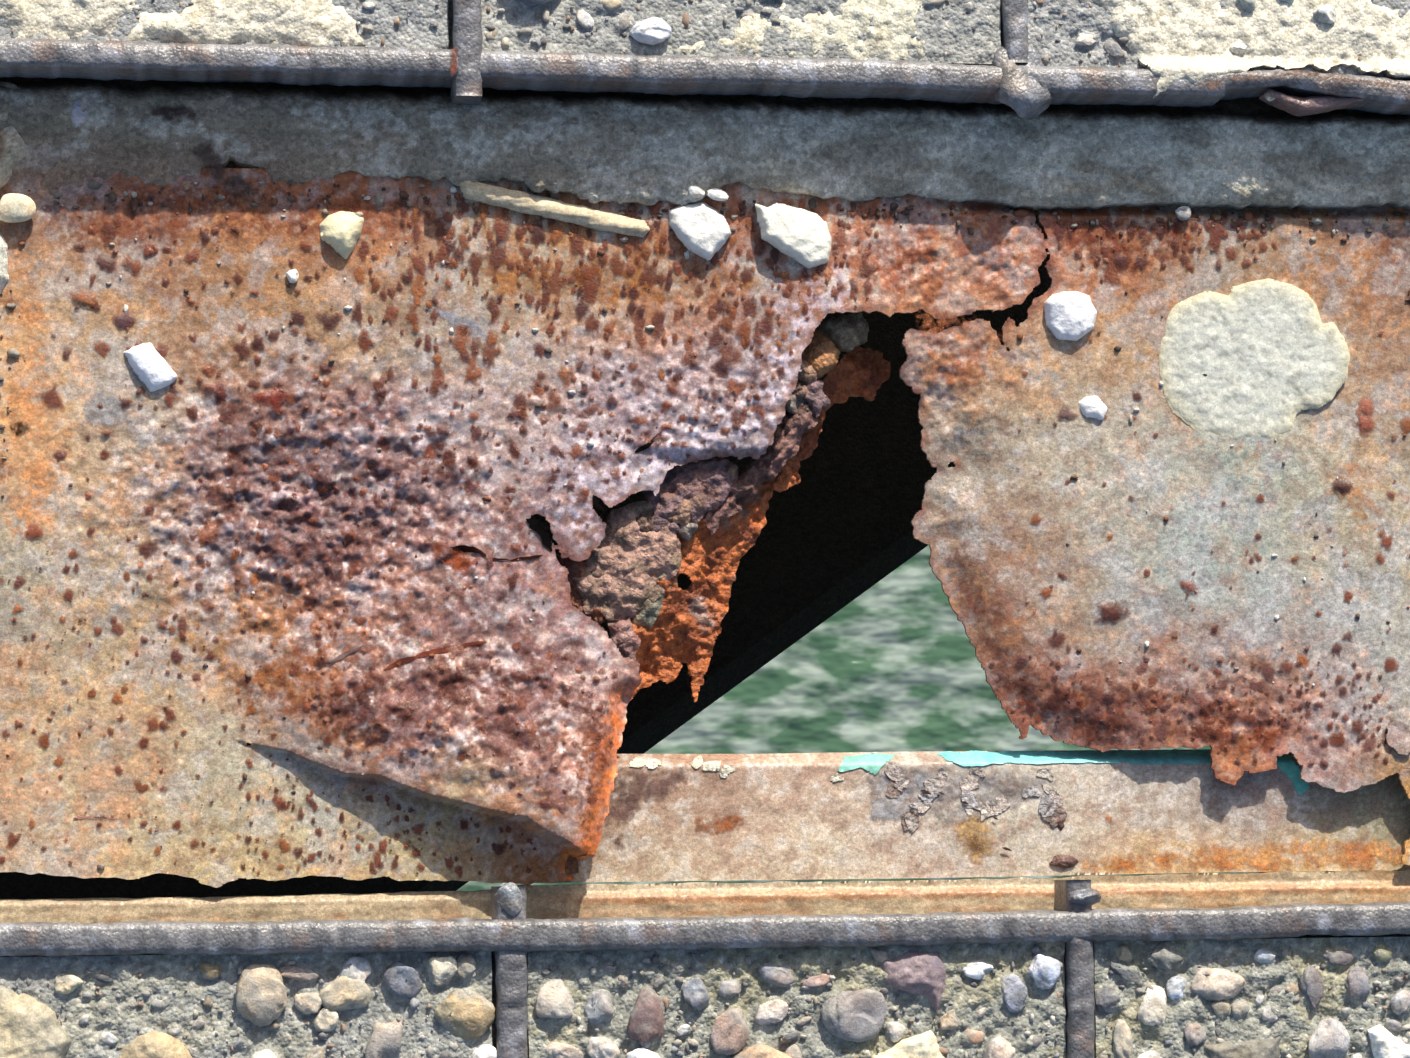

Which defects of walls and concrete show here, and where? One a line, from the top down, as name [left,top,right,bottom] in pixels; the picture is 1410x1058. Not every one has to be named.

rust [1054,212,1277,284]
rust [1038,406,1078,427]
rust [1355,397,1373,434]
rust [1392,418,1410,440]
rust [1333,464,1372,519]
rust [0,186,936,878]
rust [1376,529,1392,563]
rust [1025,572,1067,613]
rust [1181,571,1197,610]
rust [965,589,1410,768]
rust [955,814,993,861]
rust [1049,838,1402,873]